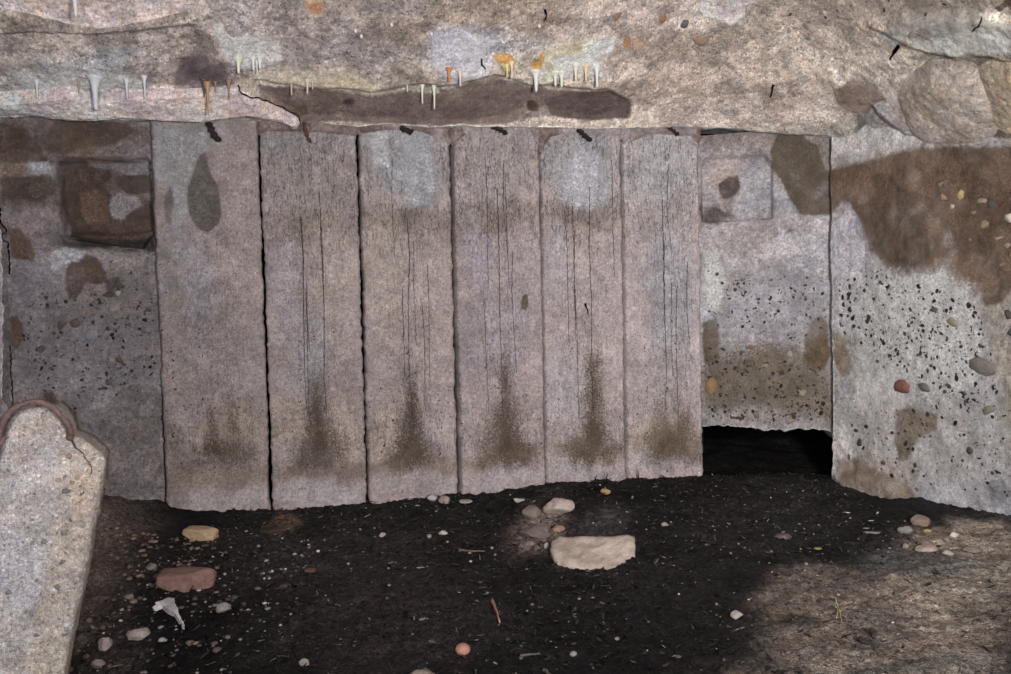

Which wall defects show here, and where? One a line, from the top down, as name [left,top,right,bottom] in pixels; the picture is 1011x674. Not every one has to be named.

crack [237,85,300,121]
damp [177,21,631,211]
damp [0,66,221,299]
crack [0,208,11,274]
damp [771,129,1011,460]
crack [7,347,15,405]
damp [290,381,347,467]
damp [381,369,442,472]
damp [478,353,538,469]
damp [565,350,624,471]